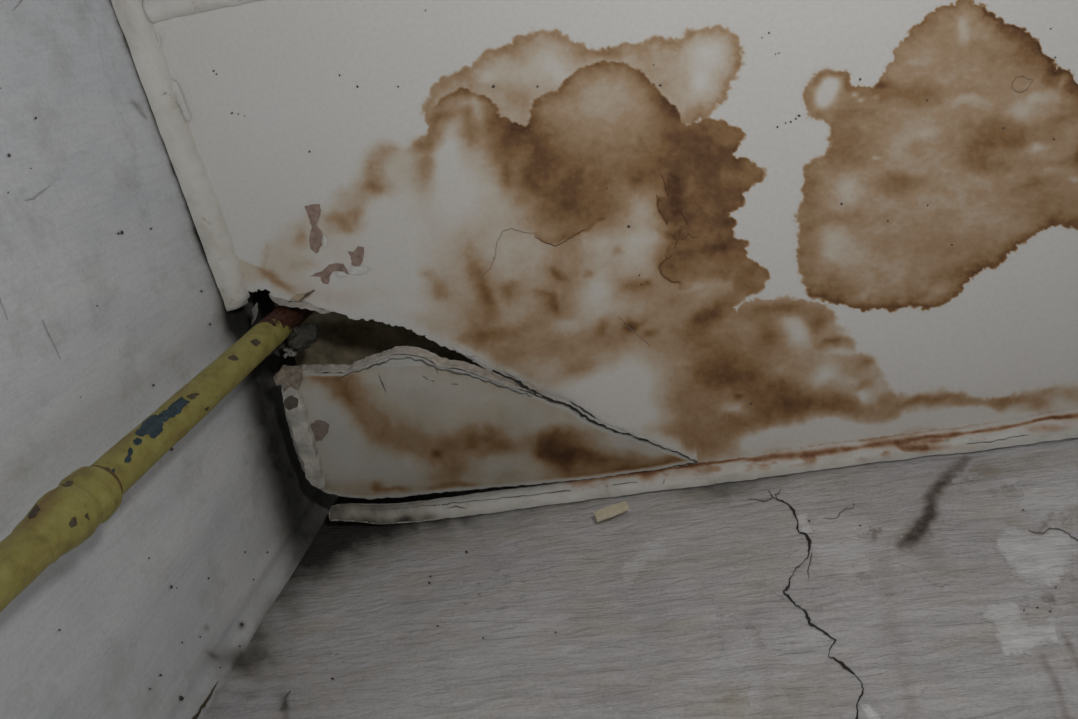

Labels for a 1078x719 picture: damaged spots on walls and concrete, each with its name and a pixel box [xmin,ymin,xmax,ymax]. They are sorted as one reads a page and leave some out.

peeling [305,204,328,253]
damp [84,0,1078,463]
peeling [284,395,298,410]
peeling [310,420,329,441]
damp [149,349,961,719]
rust [554,409,1078,495]
damp [948,438,1078,538]
crack [750,490,883,719]